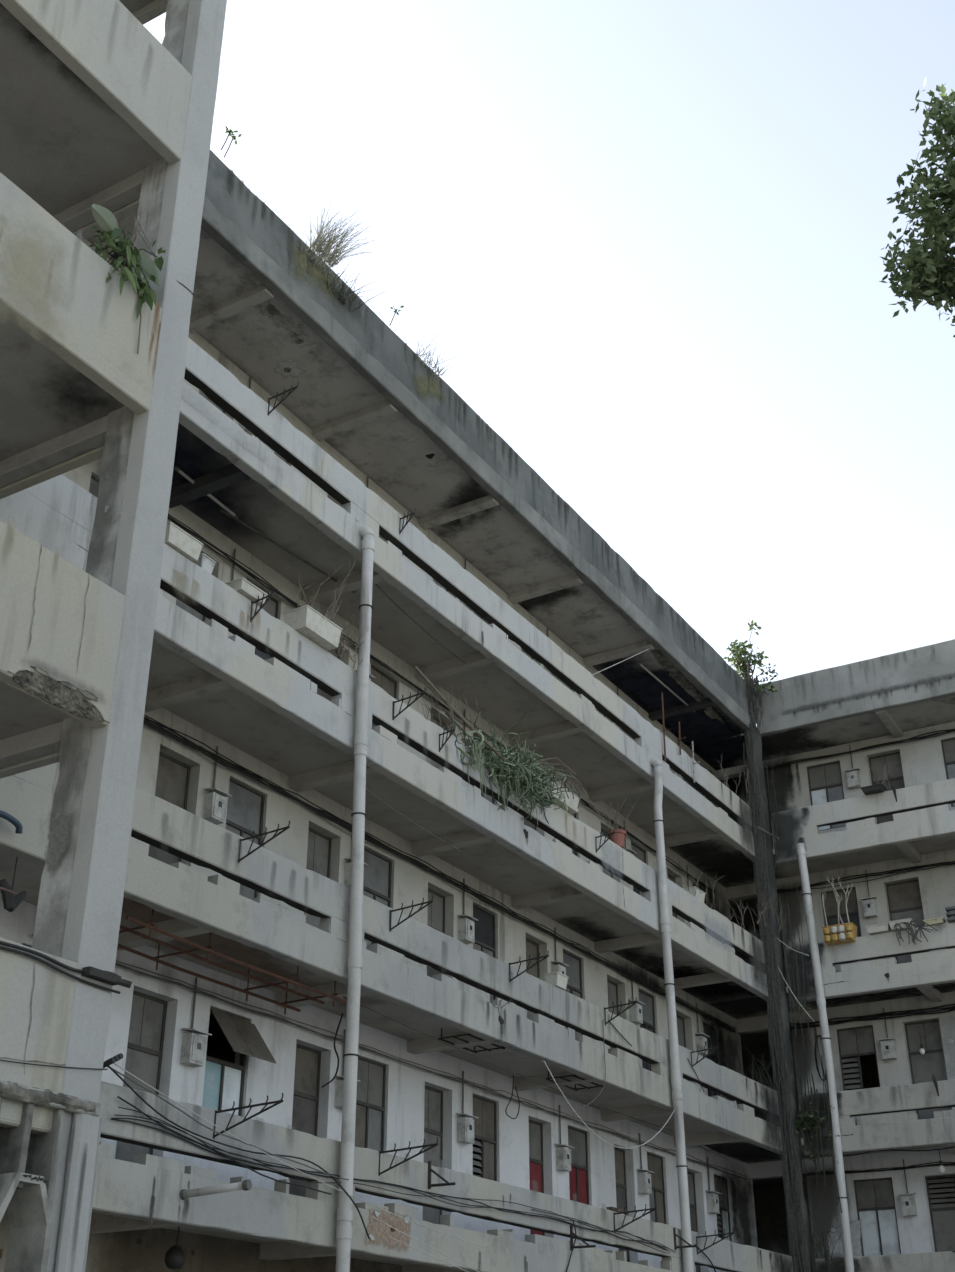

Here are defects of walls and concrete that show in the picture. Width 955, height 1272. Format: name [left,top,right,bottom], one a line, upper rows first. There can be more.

crack [28,544,42,649]
spalling [7,666,110,723]
water stain [563,670,782,1162]
water stain [761,674,955,1007]
water stain [721,1176,794,1272]
water stain [790,1024,861,1272]